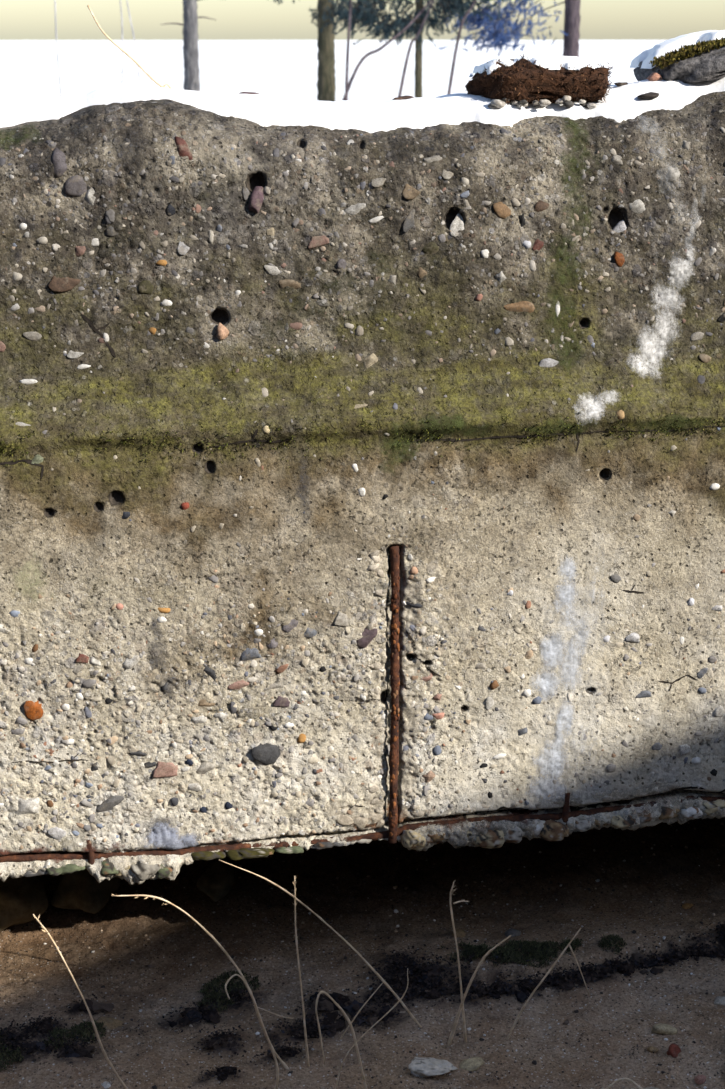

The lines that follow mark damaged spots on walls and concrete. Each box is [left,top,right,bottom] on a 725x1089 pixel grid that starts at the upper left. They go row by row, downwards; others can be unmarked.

leakage [632,249,692,373]
leakage [583,392,614,419]
spalling [187,550,725,861]
rust [421,815,464,829]
rust [506,807,570,824]
rust [0,845,98,863]
spalling [23,863,88,877]
spalling [100,855,172,884]